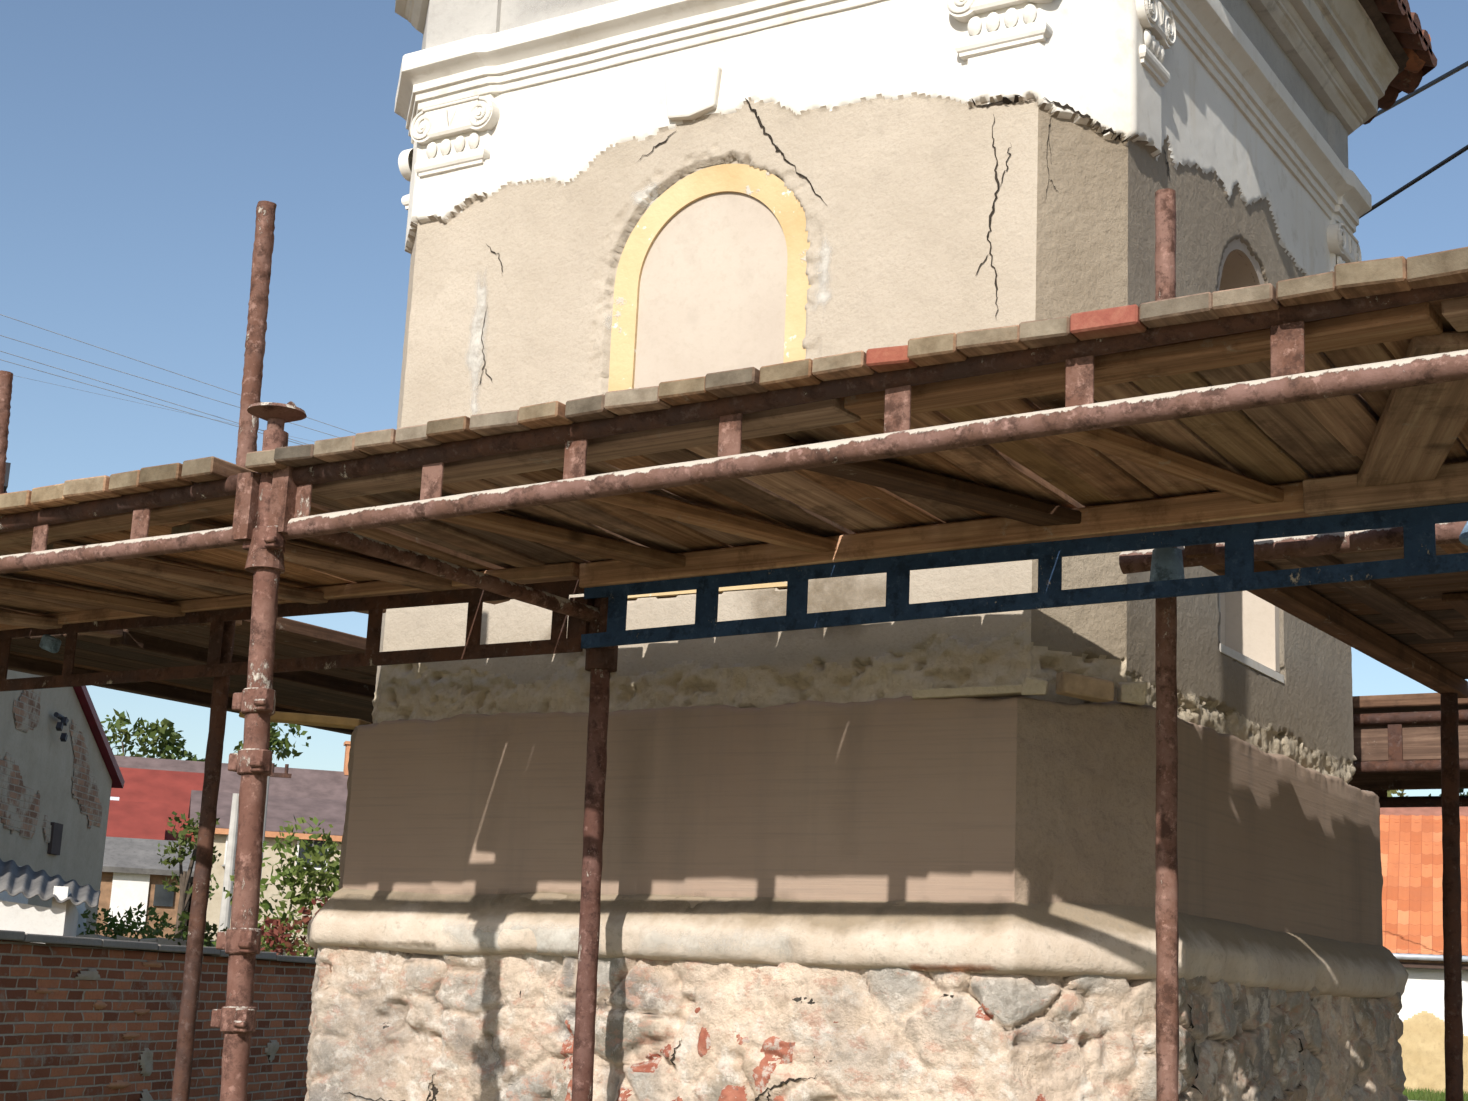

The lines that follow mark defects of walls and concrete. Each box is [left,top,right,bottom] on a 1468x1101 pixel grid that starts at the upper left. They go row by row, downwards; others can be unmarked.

crack [745,98,826,204]
peeling [397,92,1307,428]
crack [968,95,1131,317]
peeling [12,677,41,732]
spalling [371,599,590,723]
peeling [609,552,1156,712]
peeling [1177,566,1357,784]
peeling [0,752,52,843]
peeling [69,720,102,829]